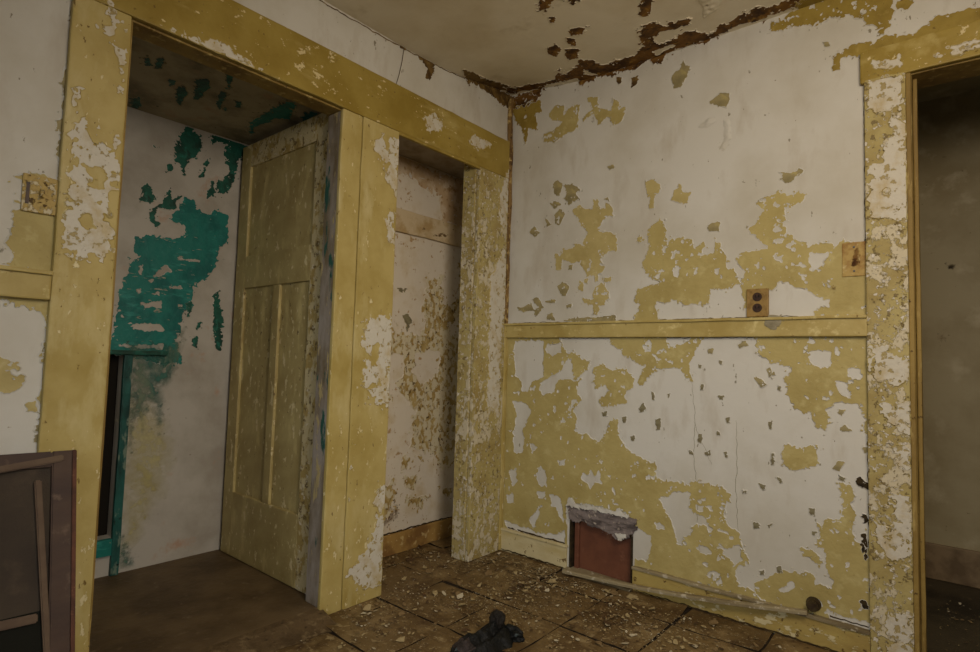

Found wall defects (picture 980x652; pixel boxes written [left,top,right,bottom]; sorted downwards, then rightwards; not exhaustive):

peeling [0,356,27,395]
peeling [0,297,48,371]
peeling [2,65,122,271]
peeling [95,0,143,109]
peeling [97,100,320,536]
peeling [159,24,264,71]
peeling [372,132,463,245]
peeling [422,112,446,136]
peeling [517,180,618,322]
peeling [462,0,980,229]
peeling [633,167,867,320]
peeling [337,245,914,652]